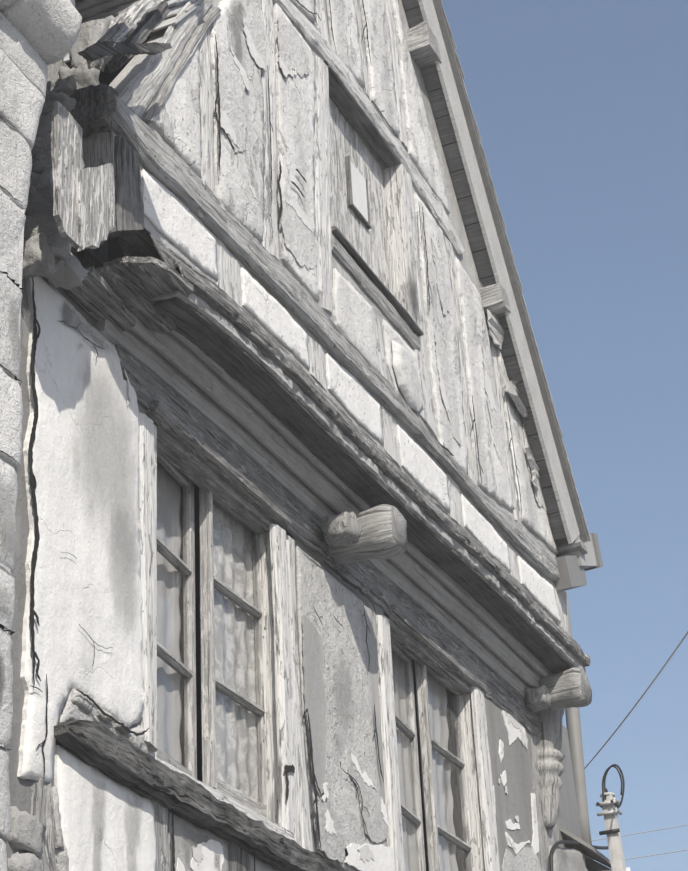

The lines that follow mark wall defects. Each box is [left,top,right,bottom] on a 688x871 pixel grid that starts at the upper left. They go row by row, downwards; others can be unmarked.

flaking render [243,2,267,72]
flaking render [277,15,310,78]
crack [214,35,222,176]
crack [267,65,307,219]
crack [471,396,483,484]
crack [504,387,522,516]
crack [0,271,105,779]
peeling [302,615,395,871]
peeling [493,710,528,816]
peeling [176,839,224,871]
peeling [502,793,542,871]